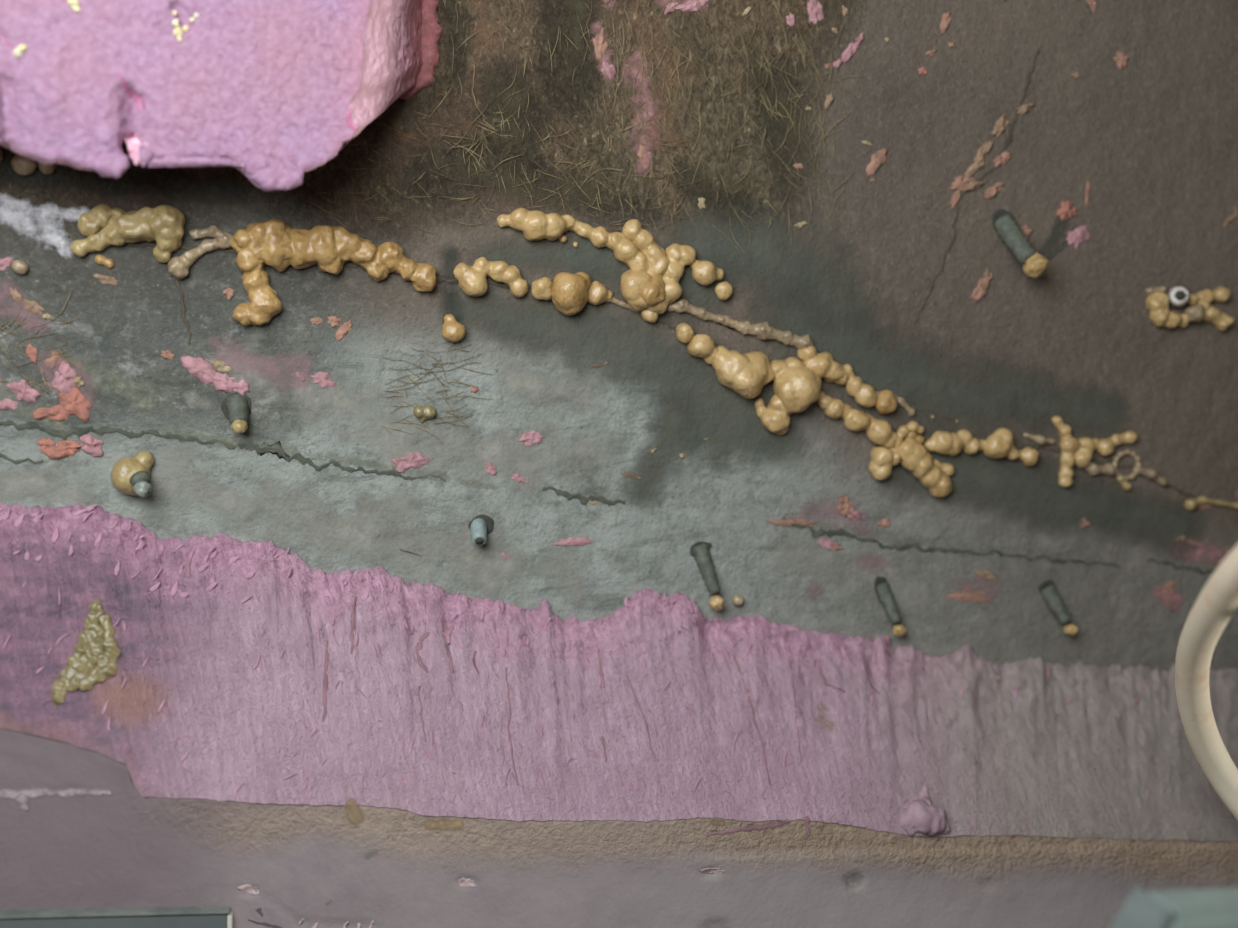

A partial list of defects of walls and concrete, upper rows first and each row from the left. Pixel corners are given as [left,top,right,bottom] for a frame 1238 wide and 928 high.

damp [0,194,91,257]
crack [344,261,397,275]
crack [436,274,531,289]
damp [482,237,630,284]
damp [673,220,1122,432]
damp [446,249,798,501]
crack [0,421,445,481]
crack [542,486,625,505]
damp [922,434,1230,561]
peeling [552,537,593,546]
peeling [767,518,844,551]
crack [783,517,1215,575]